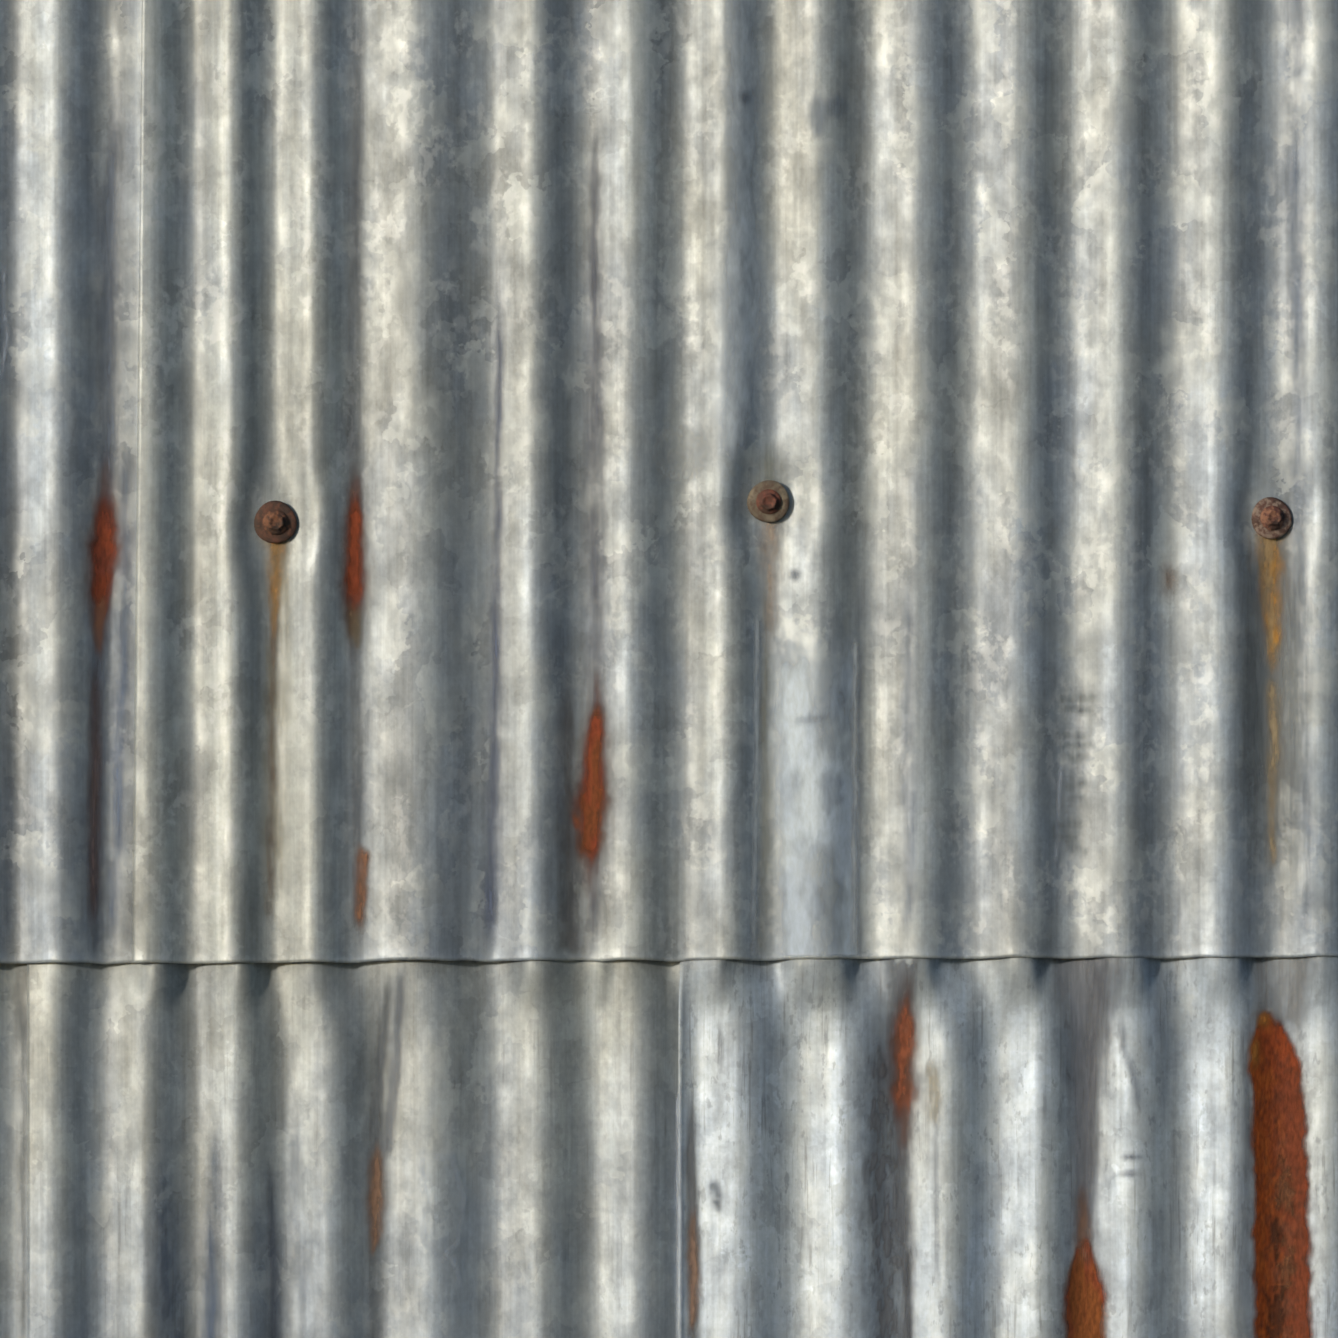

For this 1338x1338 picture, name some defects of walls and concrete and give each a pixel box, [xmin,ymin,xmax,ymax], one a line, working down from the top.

rust [89,482,118,634]
rust [344,485,363,641]
rust [573,690,605,873]
rust [356,849,369,921]
rust [893,1006,914,1144]
rust [1249,1014,1312,1338]
rust [1064,1203,1105,1338]